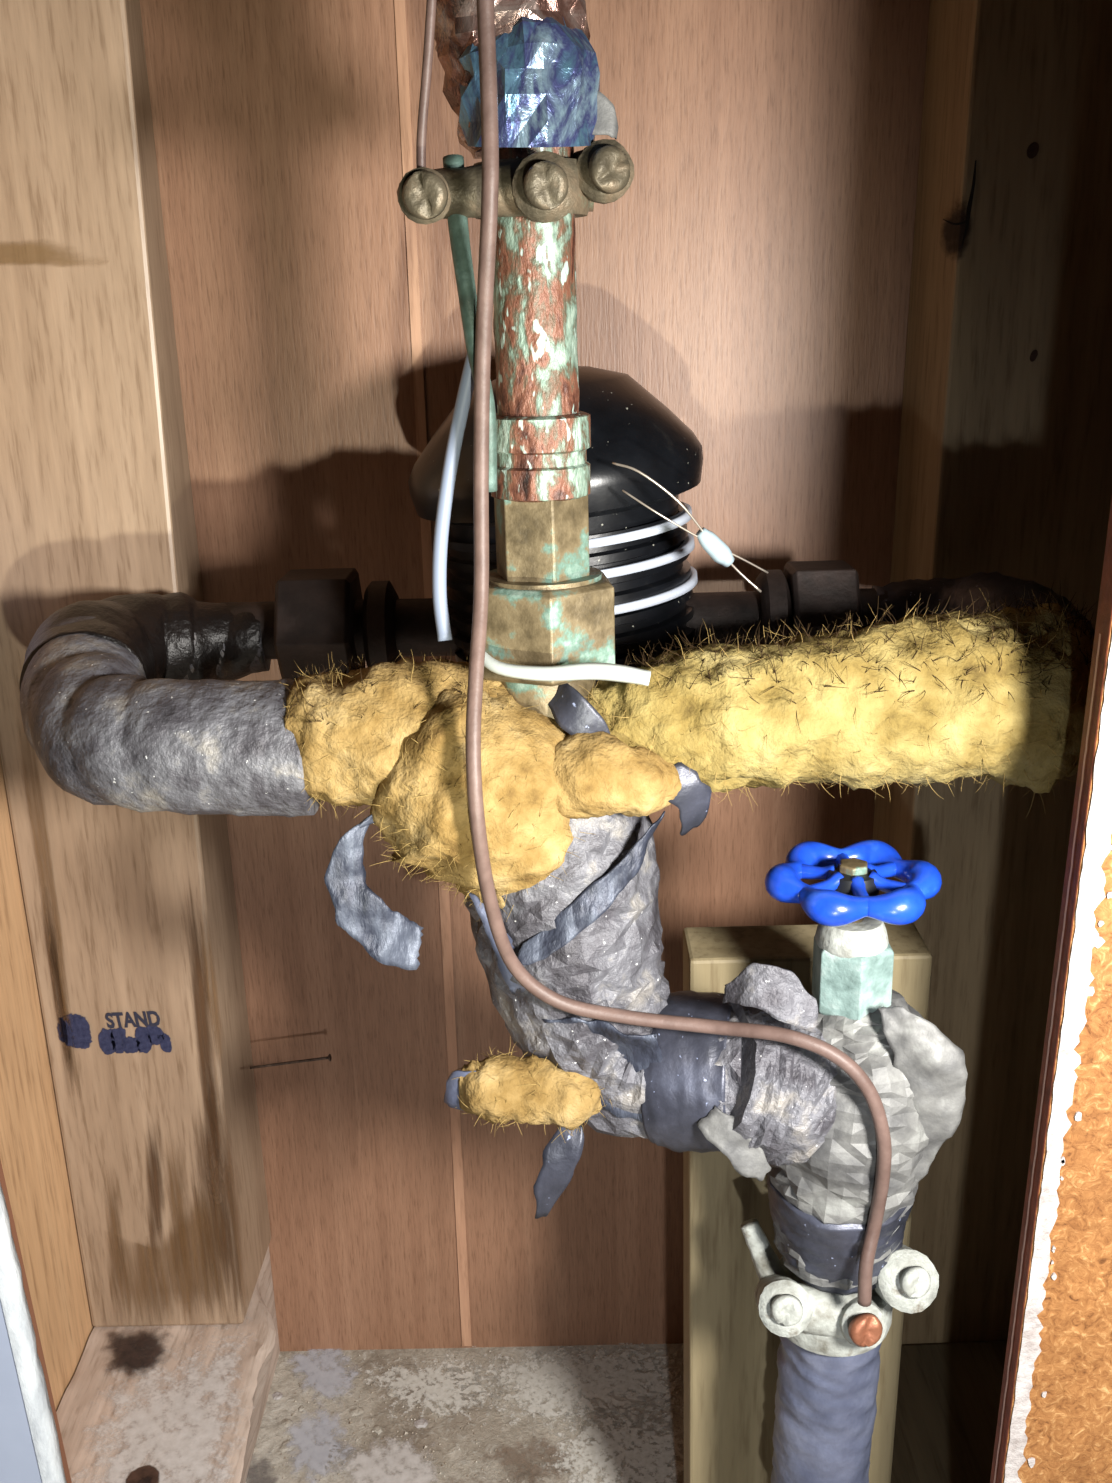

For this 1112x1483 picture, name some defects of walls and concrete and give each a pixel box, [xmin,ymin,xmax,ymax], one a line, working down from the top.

leakage [111,938,242,1305]
leakage [108,1331,164,1375]